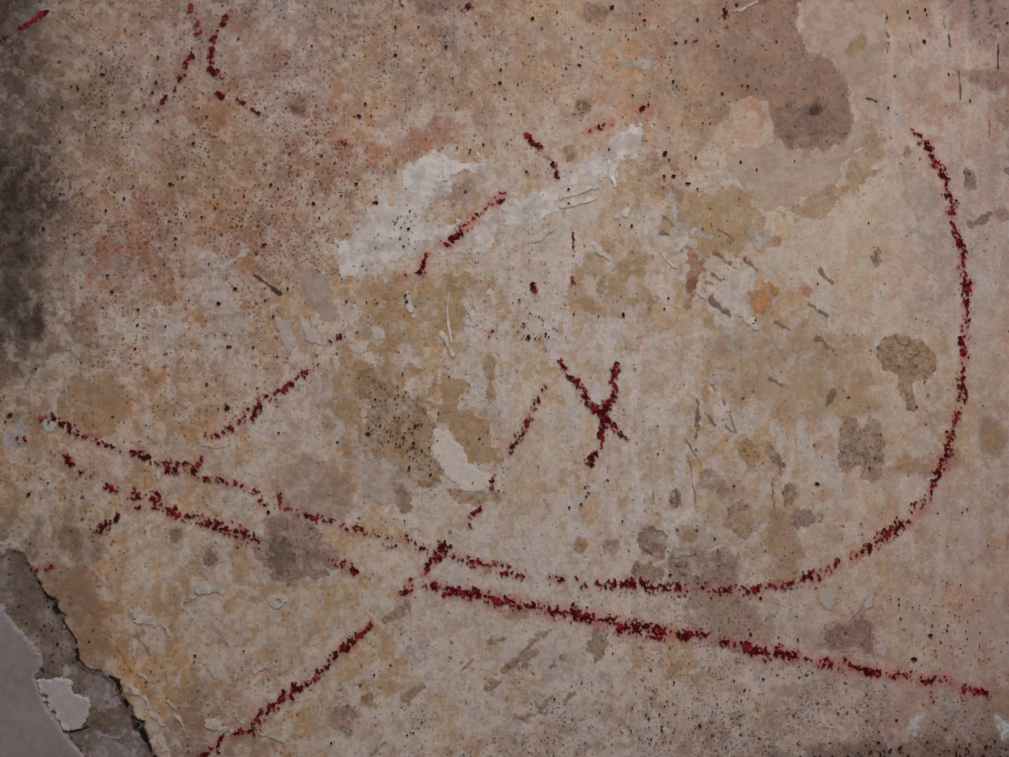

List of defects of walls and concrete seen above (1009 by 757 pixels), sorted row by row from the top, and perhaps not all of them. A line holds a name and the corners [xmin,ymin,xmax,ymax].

spalling [0,548,154,757]